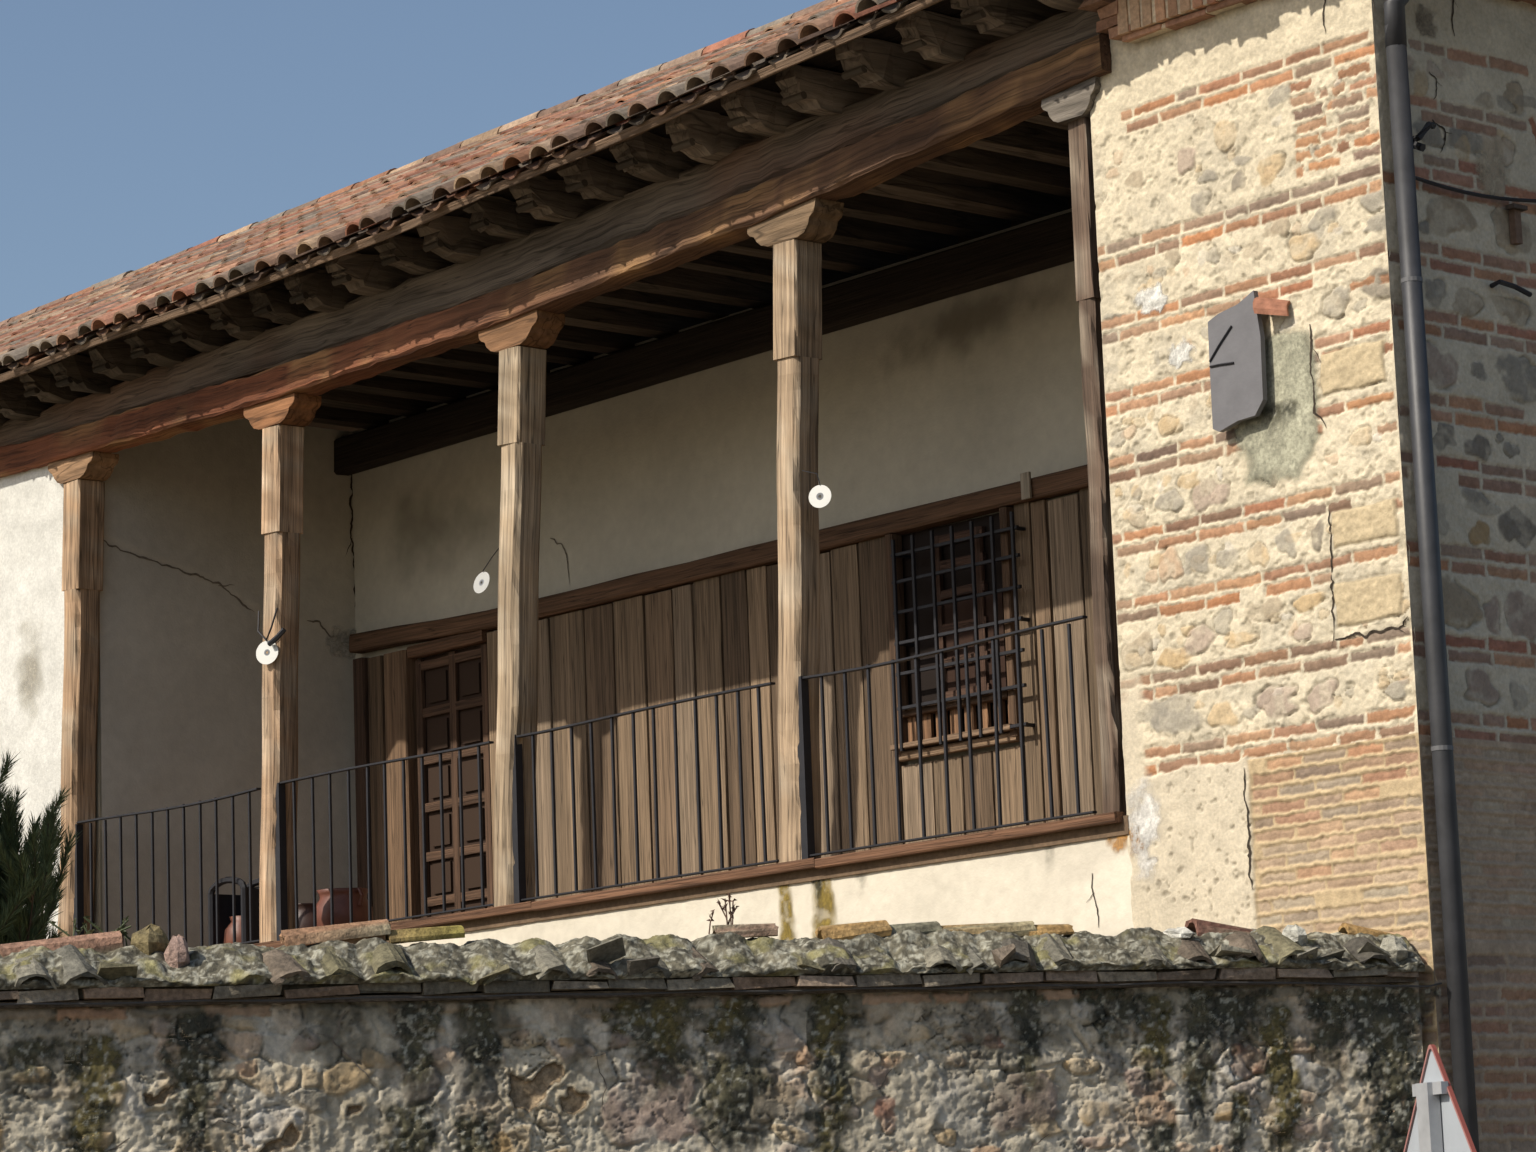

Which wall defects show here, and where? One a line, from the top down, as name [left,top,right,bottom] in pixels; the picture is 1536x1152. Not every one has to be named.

crack [104,540,254,612]
crack [1328,512,1408,643]
crack [1243,770,1253,889]
damp [6,1035,122,1152]
damp [159,1012,227,1147]
damp [377,1102,438,1152]
damp [392,1002,501,1083]
damp [455,1116,496,1152]
damp [592,997,771,1150]
damp [802,993,858,1152]
damp [1008,989,1045,1091]
damp [1073,986,1441,1152]